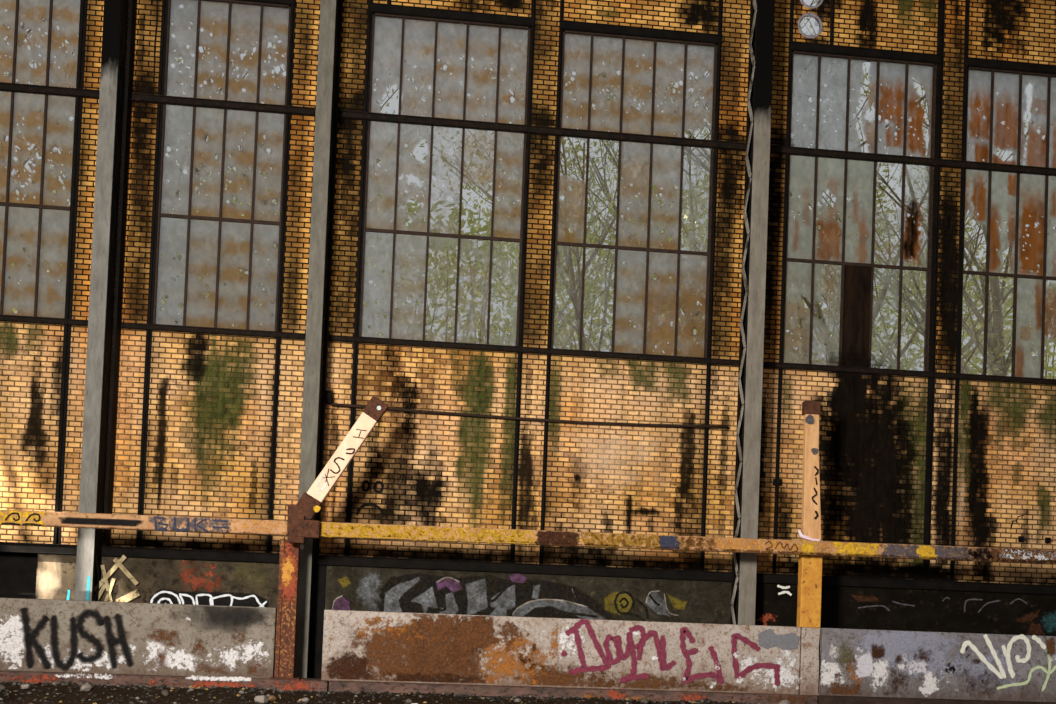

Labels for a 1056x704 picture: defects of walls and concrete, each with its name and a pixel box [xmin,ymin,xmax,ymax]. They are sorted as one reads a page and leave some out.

water stain [0,321,42,355]
water stain [22,341,63,473]
water stain [181,333,208,385]
water stain [361,419,394,524]
water stain [384,345,419,457]
water stain [416,473,443,526]
water stain [819,348,915,544]
water stain [932,380,998,548]
water stain [1037,393,1056,439]
peeling [0,614,268,688]
peeling [273,679,319,691]
rust [325,614,747,701]